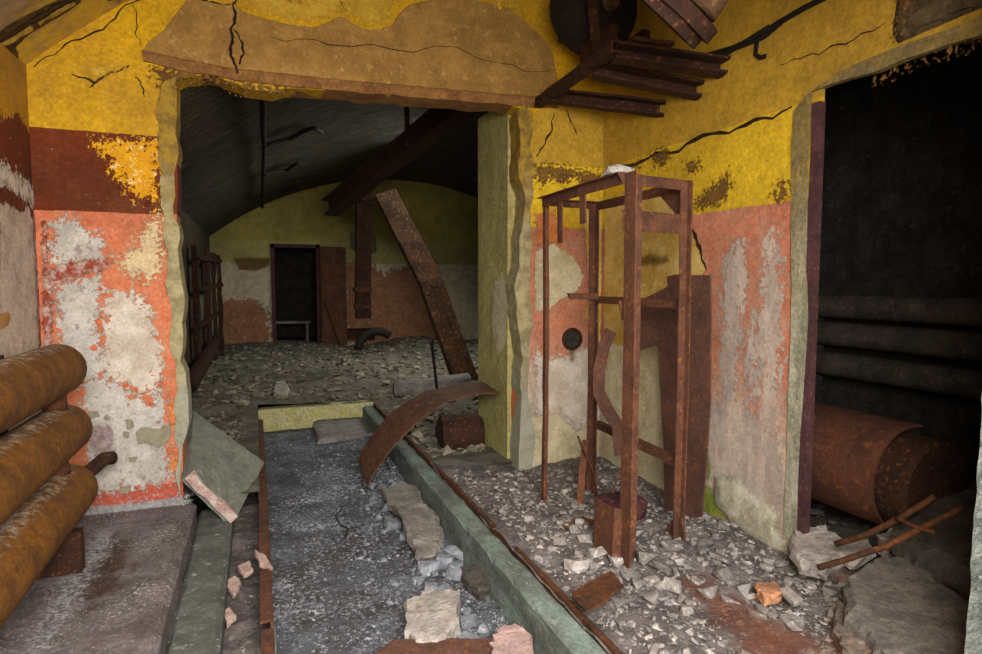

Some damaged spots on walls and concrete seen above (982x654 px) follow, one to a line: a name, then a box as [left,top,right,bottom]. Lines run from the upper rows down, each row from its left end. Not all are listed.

crack [34,0,145,97]
crack [203,0,245,73]
flaking render [142,0,558,114]
crack [781,23,884,65]
flaking render [888,0,982,43]
crack [602,106,792,176]
peeling [0,131,238,524]
peeling [531,328,621,468]
peeling [533,191,625,420]
peeling [638,345,664,490]
peeling [641,232,679,298]
peeling [708,219,790,538]